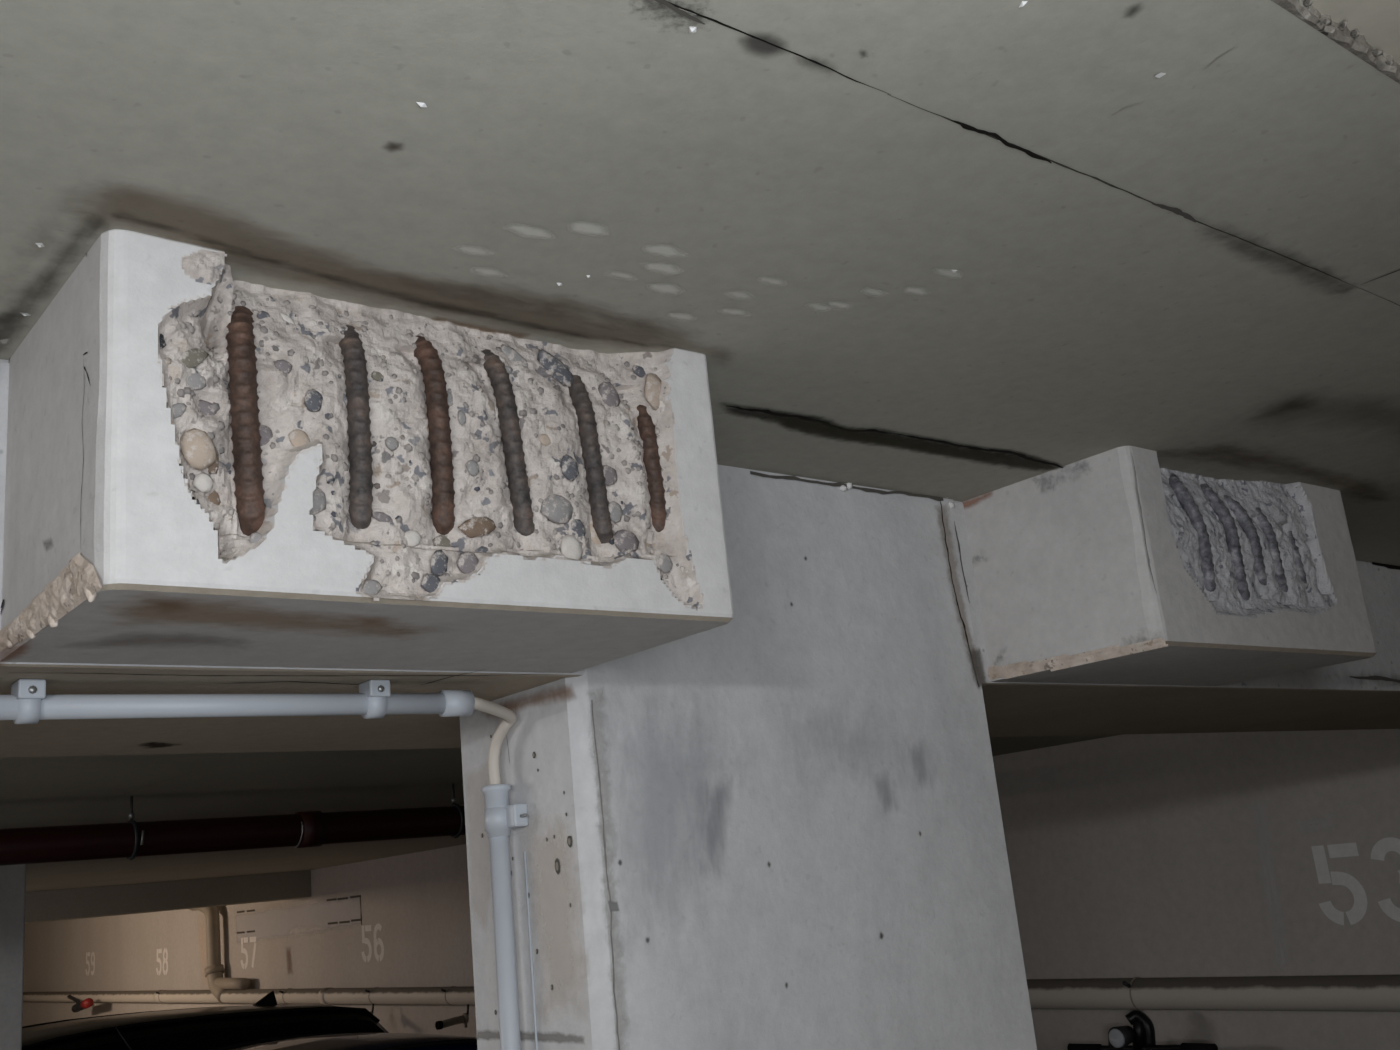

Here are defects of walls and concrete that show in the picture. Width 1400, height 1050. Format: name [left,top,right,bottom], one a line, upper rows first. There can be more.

spalling [1271,0,1400,84]
crack [655,0,1400,307]
spalling [157,249,705,611]
crack [726,405,1063,470]
spalling [0,551,102,652]
crack [750,471,985,687]
spalling [1160,468,1337,620]